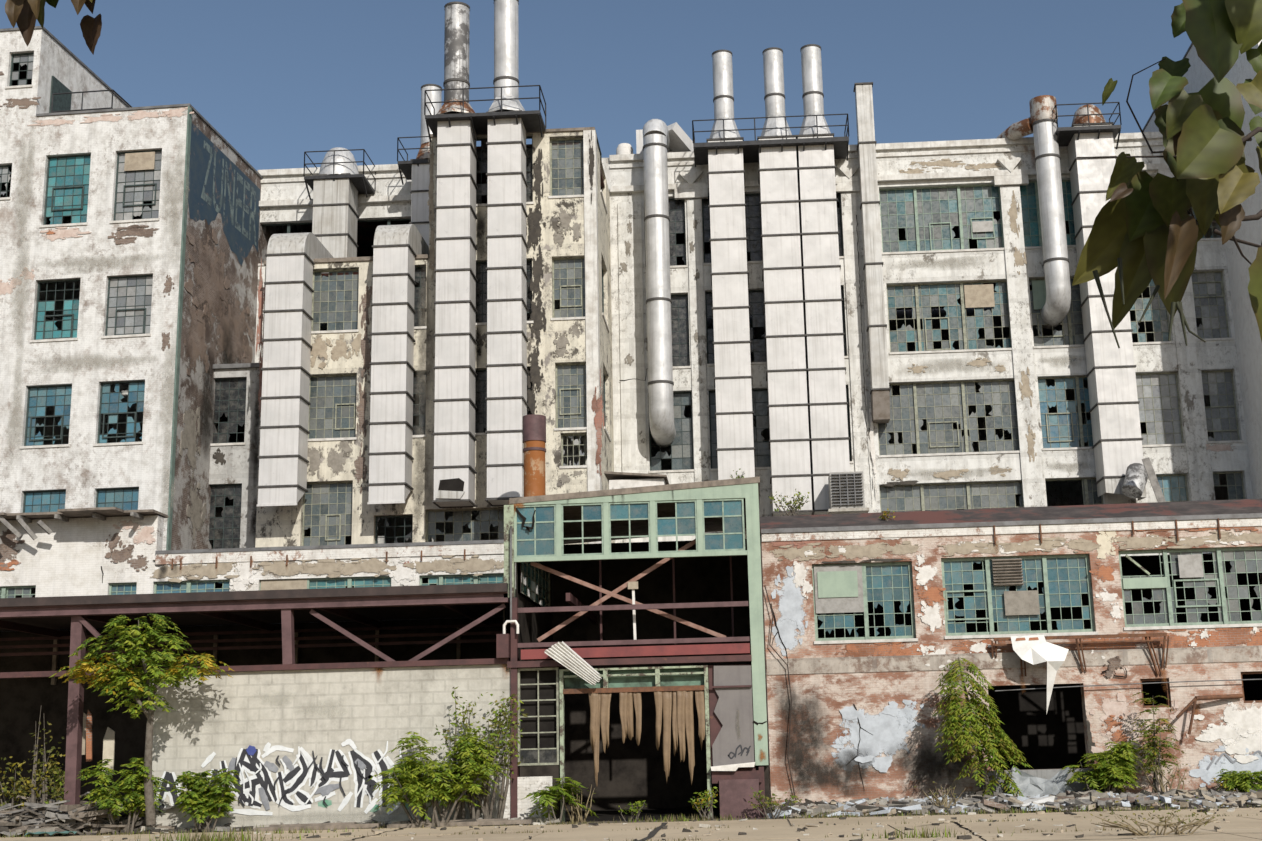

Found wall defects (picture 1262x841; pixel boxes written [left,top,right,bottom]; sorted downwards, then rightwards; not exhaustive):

peeling [107,225,159,245]
leakage [420,303,432,389]
leakage [200,338,232,446]
leakage [416,443,428,499]
spalling [0,529,25,571]
spalling [105,520,504,591]
spalling [770,526,1262,678]
leakage [782,694,866,794]
peeling [831,700,925,773]
leakage [900,744,968,788]
peeling [1085,693,1149,763]
peeling [1169,700,1262,787]